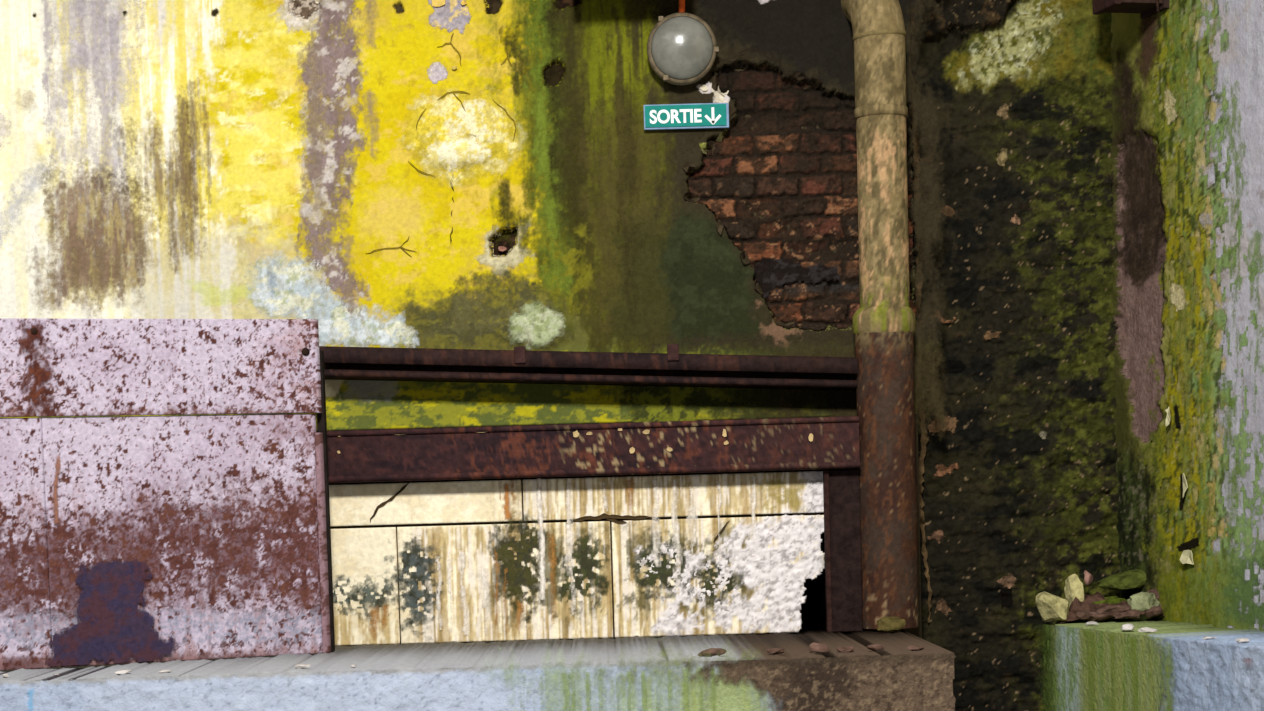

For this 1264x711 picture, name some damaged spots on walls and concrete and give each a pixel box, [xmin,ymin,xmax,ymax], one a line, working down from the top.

peeling [428,0,471,34]
water stain [248,0,573,350]
flaking render [683,59,860,331]
rust [17,320,55,413]
peeling [1198,0,1264,630]
rust [53,456,61,524]
rust [45,559,178,666]
crack [370,482,410,522]
water stain [333,536,468,634]
water stain [481,479,608,623]
water stain [629,479,743,605]
spalling [687,654,956,711]